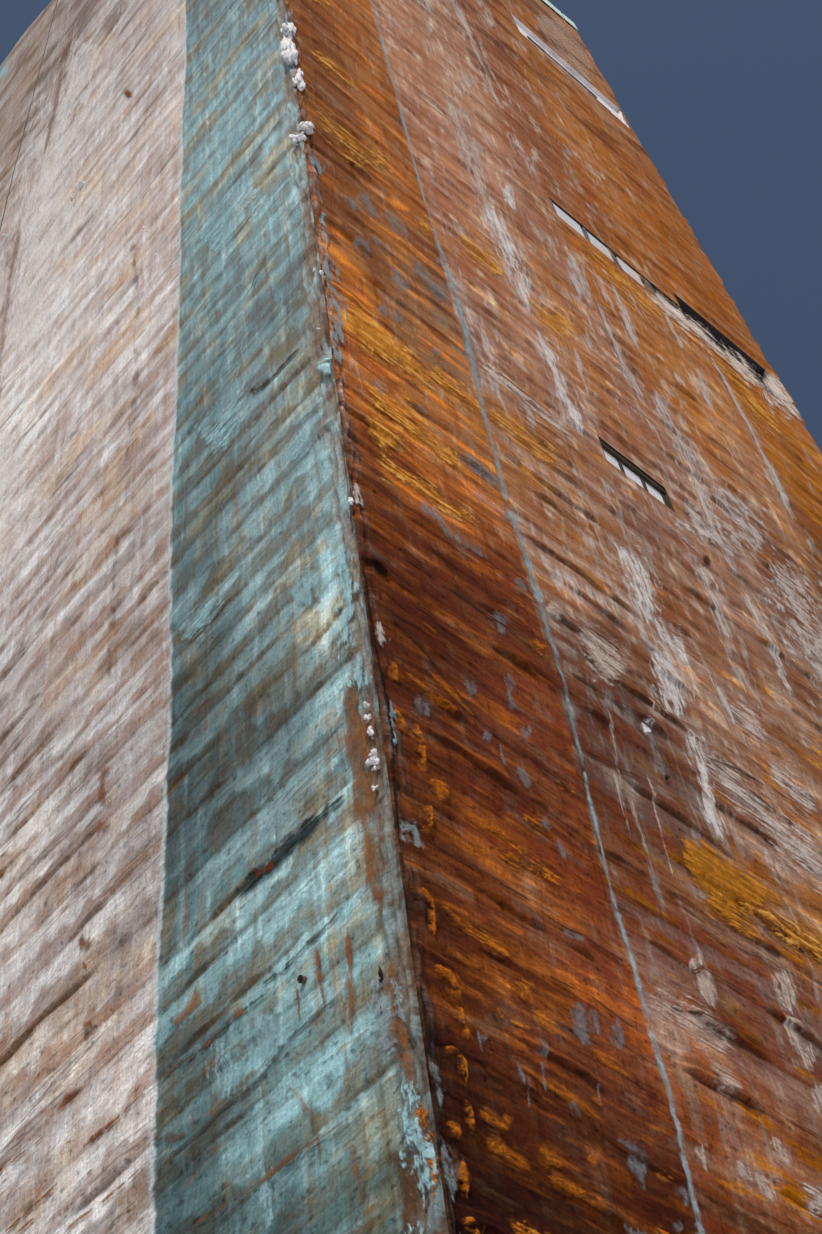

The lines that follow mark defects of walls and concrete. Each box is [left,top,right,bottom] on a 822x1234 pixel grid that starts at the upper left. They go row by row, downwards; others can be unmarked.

corrosion [319,112,392,172]
leakage [446,101,530,311]
corrosion [345,297,555,462]
leakage [483,334,583,436]
corrosion [361,381,472,522]
leakage [599,286,822,716]
leakage [580,629,625,686]
leakage [717,687,766,745]
leakage [686,731,822,893]
corrosion [682,839,822,966]
peeling [395,1081,460,1206]
corrosion [481,1107,605,1209]